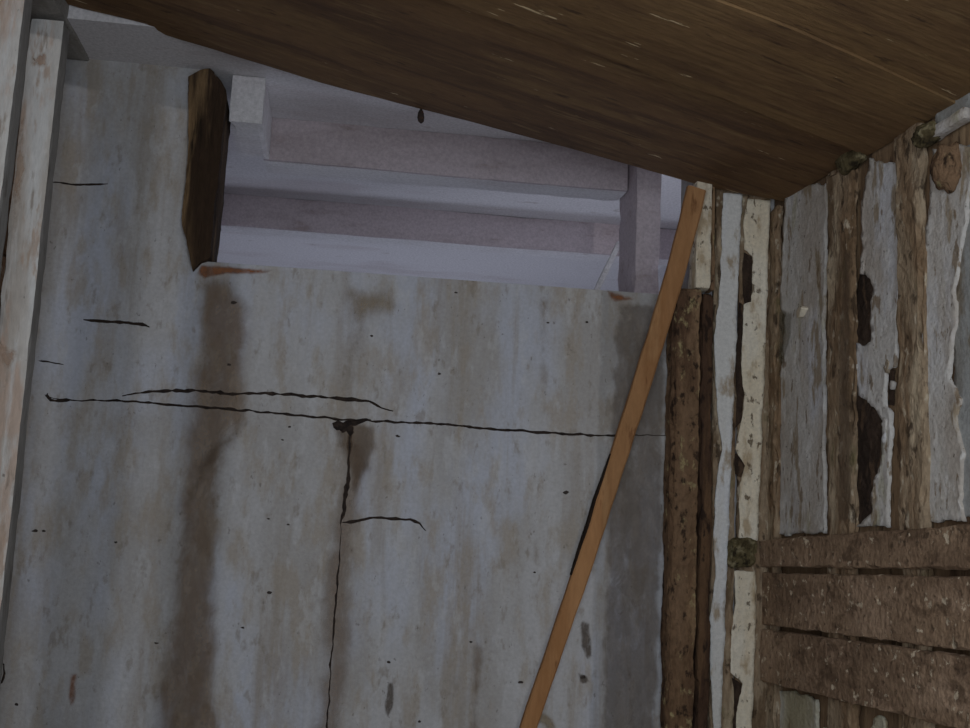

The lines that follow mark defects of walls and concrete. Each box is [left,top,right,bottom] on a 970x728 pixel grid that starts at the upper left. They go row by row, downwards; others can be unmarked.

crack [53,179,104,187]
crack [83,319,150,327]
water stain [163,284,241,728]
crack [45,388,666,728]
peeling [709,193,771,728]
peeling [780,691,820,728]
peeling [779,183,828,536]
peeling [856,158,899,528]
peeling [871,715,888,728]
peeling [922,144,970,523]